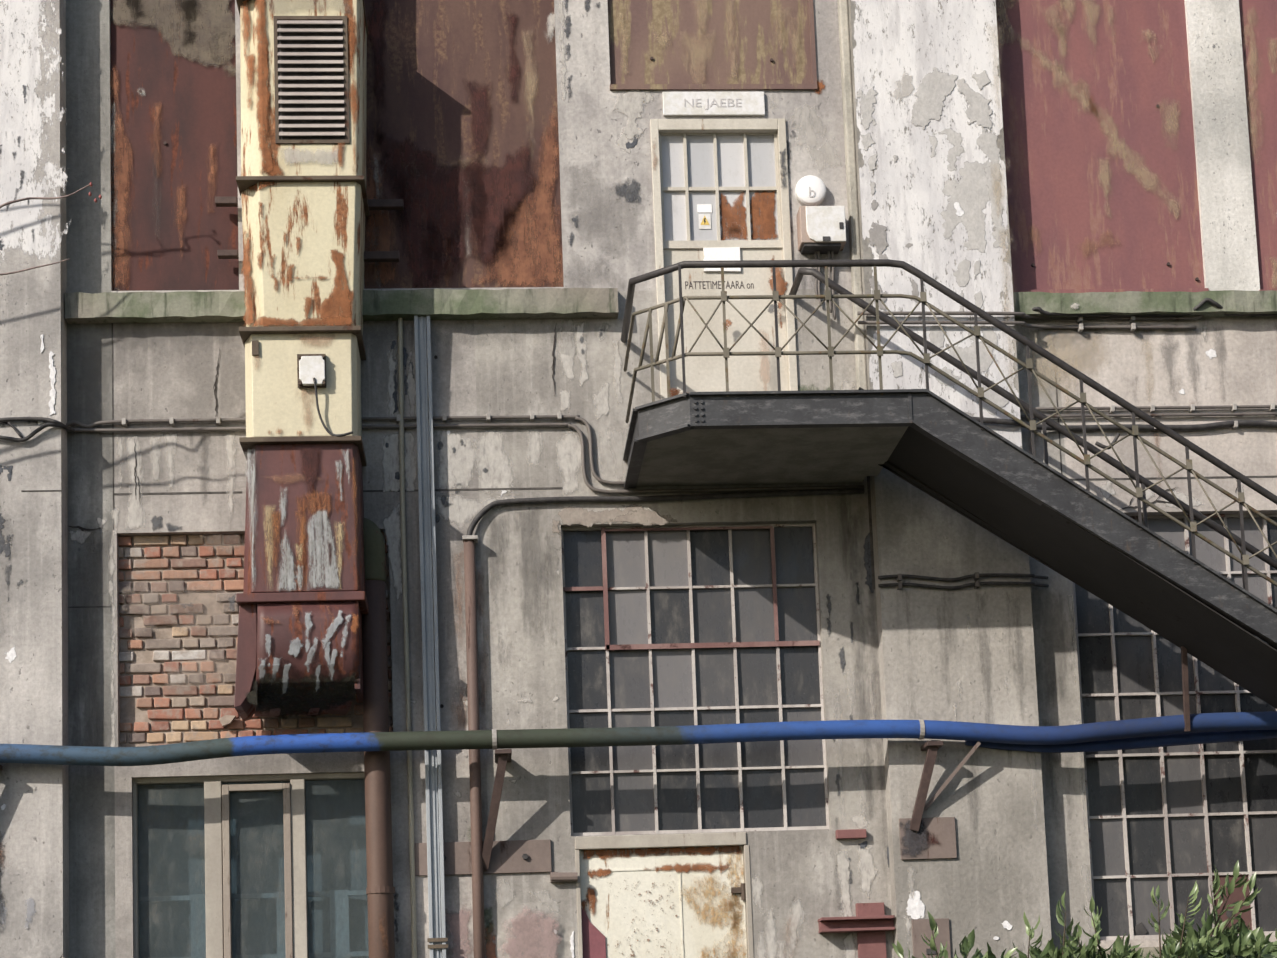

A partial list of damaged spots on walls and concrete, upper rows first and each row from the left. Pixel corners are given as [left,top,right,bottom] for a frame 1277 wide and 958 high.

corrosion [110,69,133,288]
corrosion [241,0,563,288]
corrosion [719,149,787,240]
peeling [857,86,888,259]
peeling [894,67,1007,311]
peeling [38,334,56,425]
corrosion [242,231,354,327]
corrosion [768,257,788,328]
peeling [911,279,1009,417]
peeling [0,513,12,557]
peeling [5,645,16,663]
corrosion [581,846,746,958]